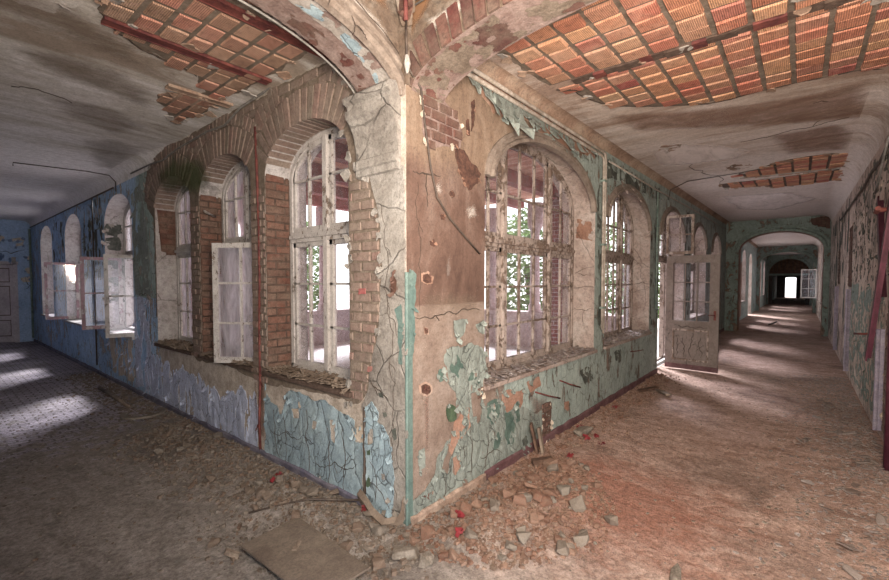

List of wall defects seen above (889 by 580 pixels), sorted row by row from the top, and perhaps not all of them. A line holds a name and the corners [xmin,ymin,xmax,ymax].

peeling [409,0,889,191]
flaking render [82,0,554,518]
crack [255,206,398,509]
crack [413,171,479,321]
flaking render [811,150,889,433]